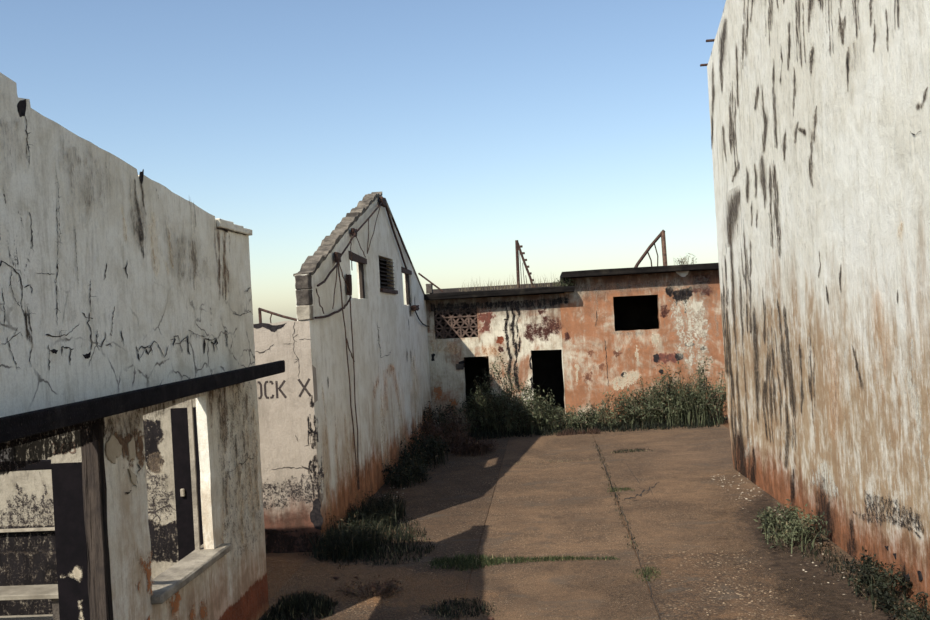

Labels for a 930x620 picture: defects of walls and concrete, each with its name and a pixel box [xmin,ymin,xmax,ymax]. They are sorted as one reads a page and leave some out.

crack [0,173,218,370]
peeling [524,308,570,342]
peeling [612,346,640,390]
damp [650,279,706,322]
peeling [651,297,712,374]
damp [711,0,900,620]
flaking render [105,409,145,475]
damp [209,382,350,562]
crack [597,448,666,620]
damp [847,490,924,559]
flaking render [166,591,207,620]